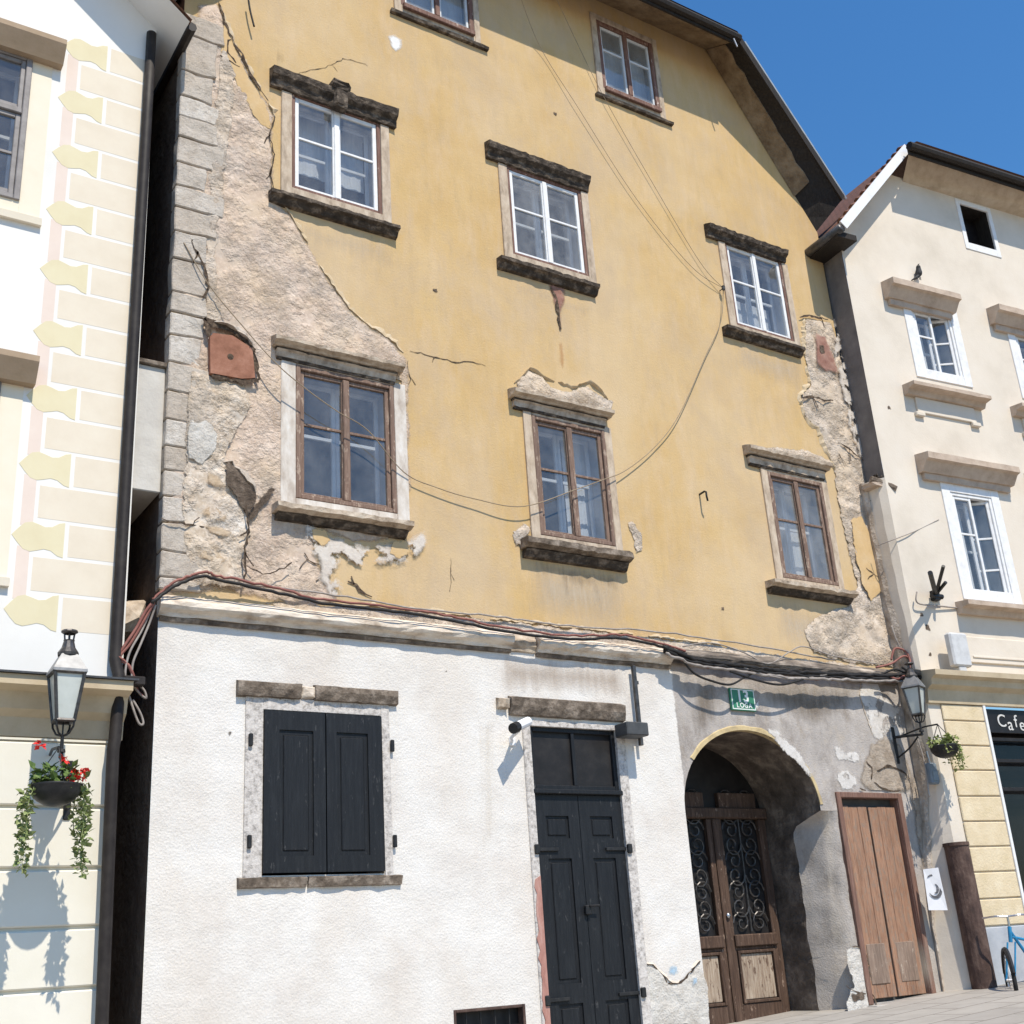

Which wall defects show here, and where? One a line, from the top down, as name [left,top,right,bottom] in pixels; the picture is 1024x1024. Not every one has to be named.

crack [218,2,275,188]
crack [407,351,483,385]
flaking render [168,3,894,667]
corrosion [550,285,564,330]
crack [240,504,322,582]
flaking render [833,683,924,869]